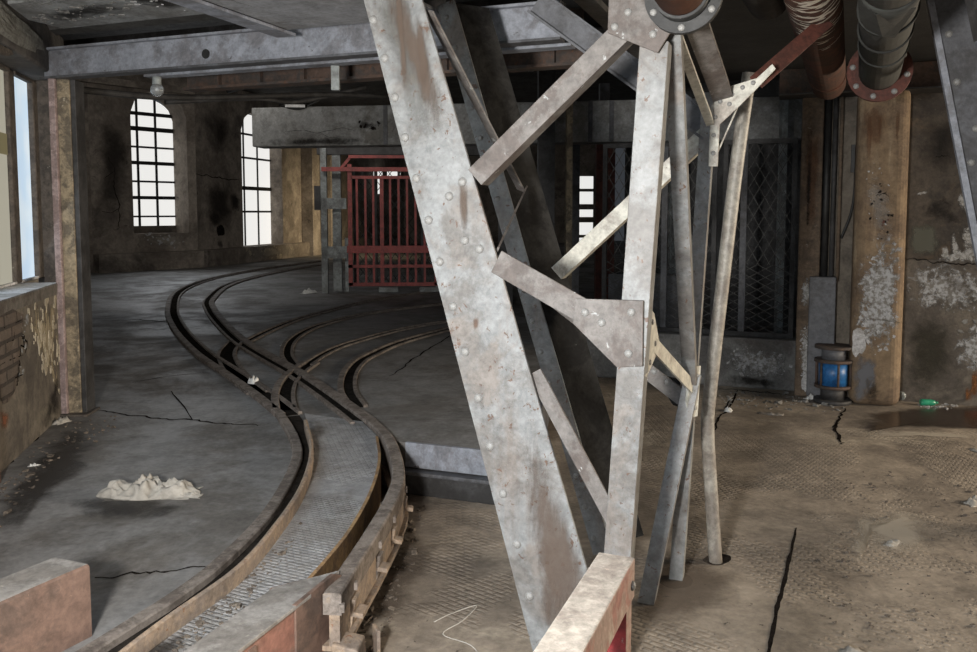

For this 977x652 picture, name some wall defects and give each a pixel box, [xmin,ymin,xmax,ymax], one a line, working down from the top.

peeling [852,167,977,370]
peeling [27,295,60,394]
crack [102,372,258,426]
crack [832,408,846,444]
water stain [867,407,977,438]
crack [95,566,206,578]